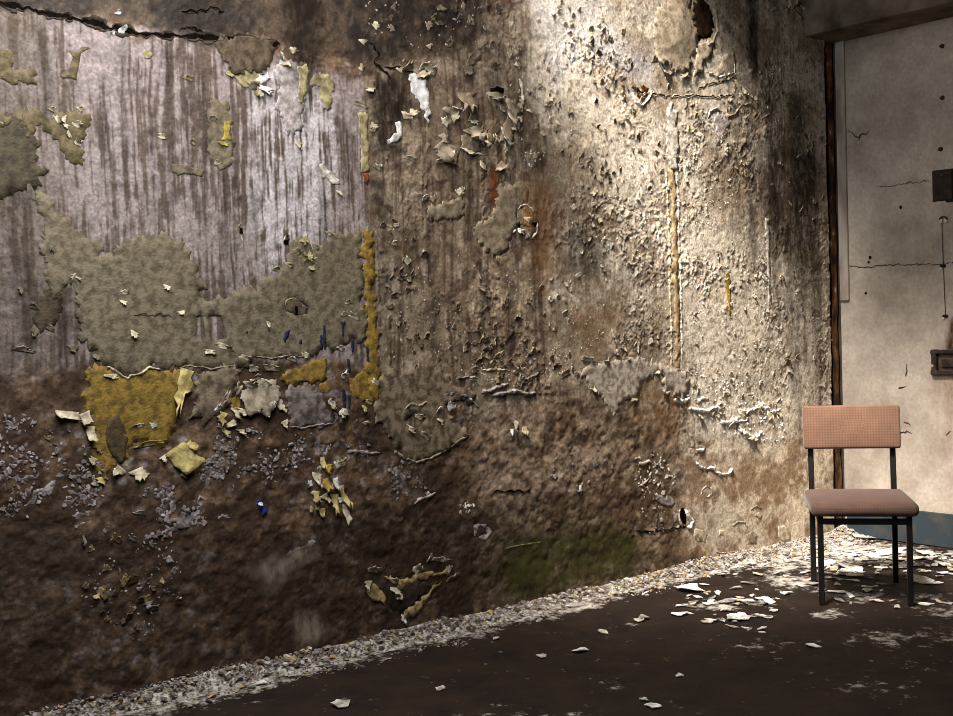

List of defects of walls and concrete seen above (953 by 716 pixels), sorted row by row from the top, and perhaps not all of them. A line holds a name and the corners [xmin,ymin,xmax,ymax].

peeling [0,49,37,85]
peeling [61,47,89,80]
crack [0,0,280,50]
peeling [215,32,335,150]
rust [490,165,498,203]
peeling [341,0,833,464]
water stain [764,143,815,246]
peeling [0,98,368,485]